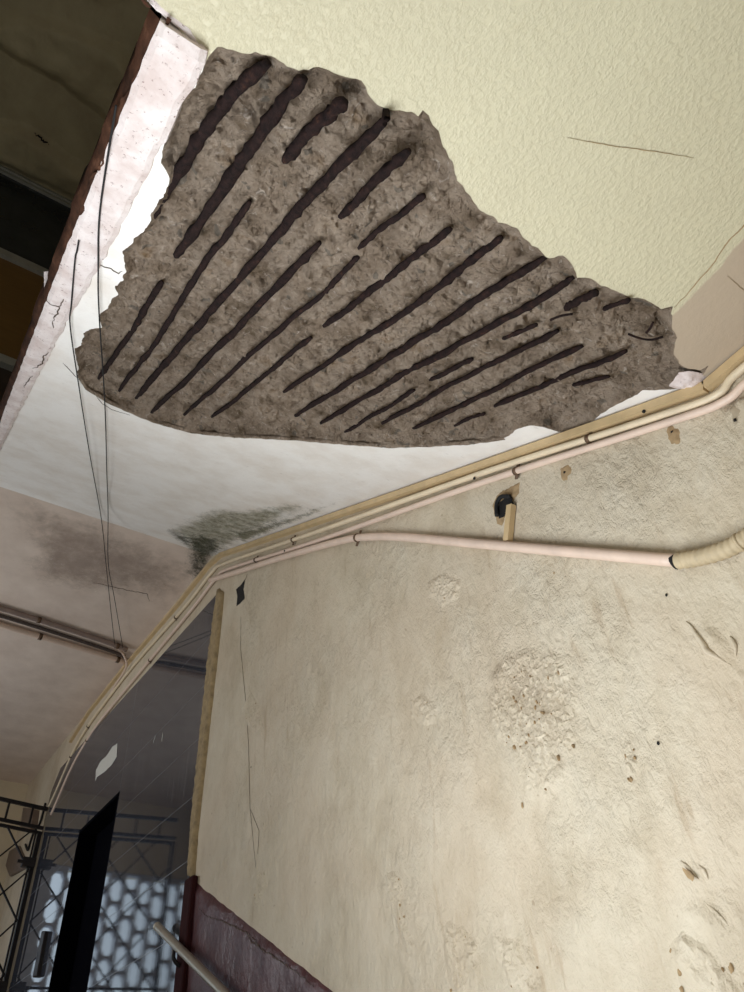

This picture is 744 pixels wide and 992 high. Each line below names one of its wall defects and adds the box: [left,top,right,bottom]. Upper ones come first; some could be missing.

crack [571,138,692,158]
spalling [0,0,708,448]
crack [674,225,744,308]
mould [173,512,299,574]
crack [247,725,259,865]
peeling [489,647,584,808]